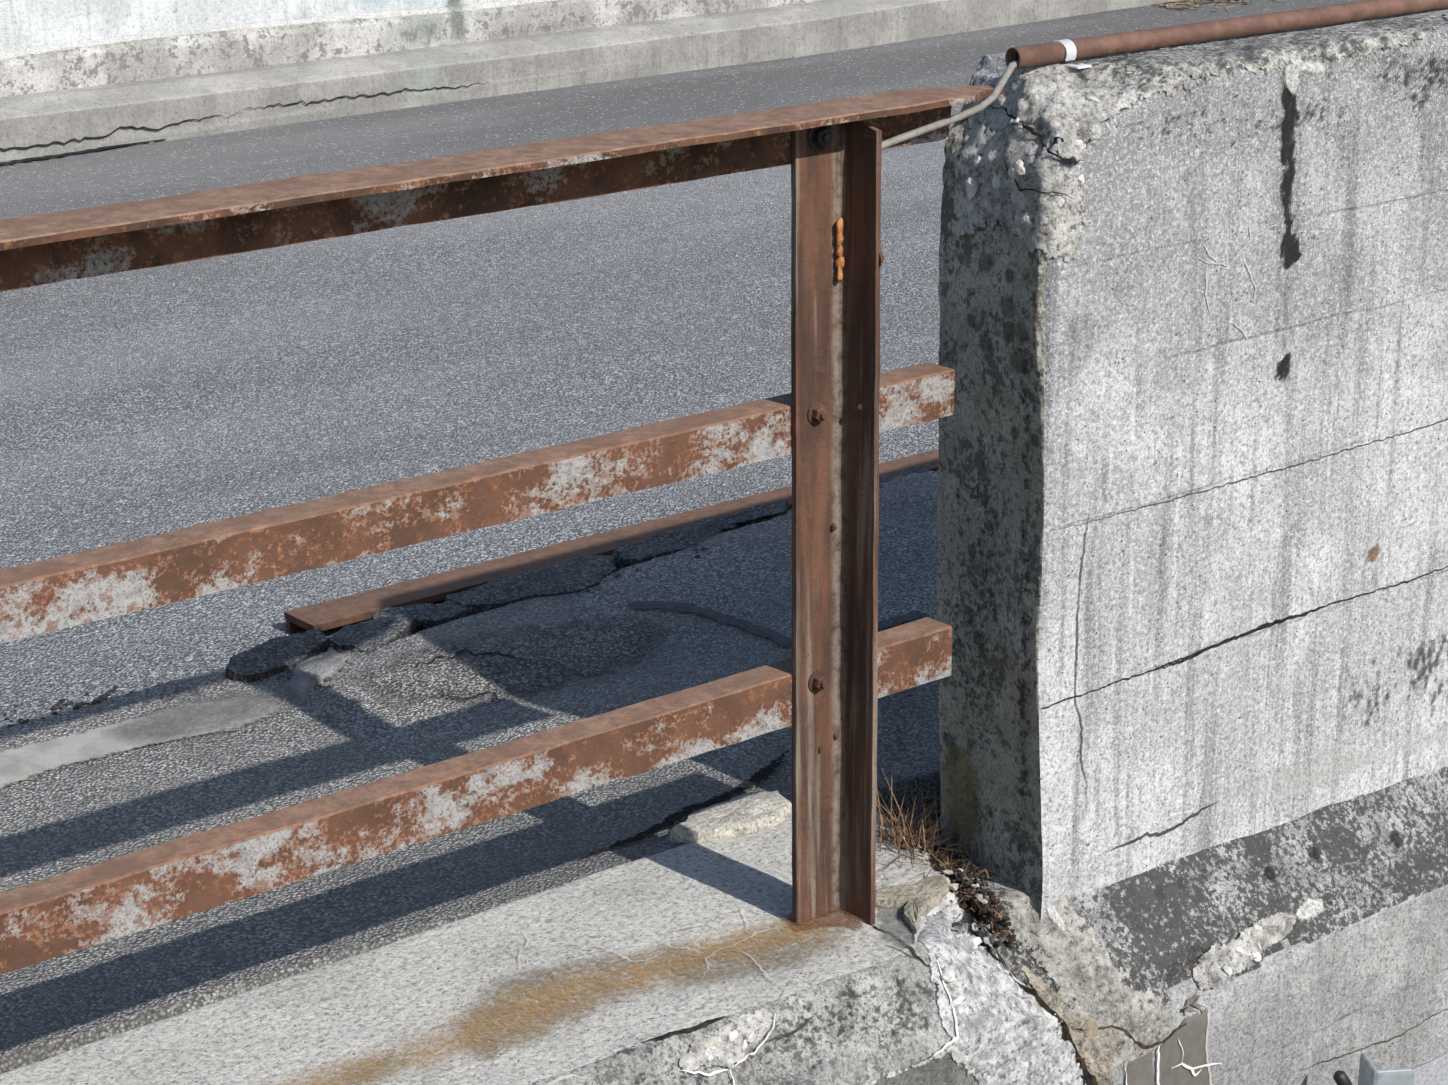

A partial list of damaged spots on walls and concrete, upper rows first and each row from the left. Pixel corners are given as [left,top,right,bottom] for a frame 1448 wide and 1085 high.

crack [0,82,491,151]
spalling [951,12,1448,262]
water stain [1378,42,1448,110]
corrosion [835,218,845,282]
water stain [942,283,1033,858]
crack [1042,418,1448,814]
water stain [1344,630,1448,734]
crack [1105,802,1219,852]
spalling [863,875,1171,1085]
crack [922,848,1221,1085]
spalling [1193,899,1323,990]
spalling [644,1008,813,1085]